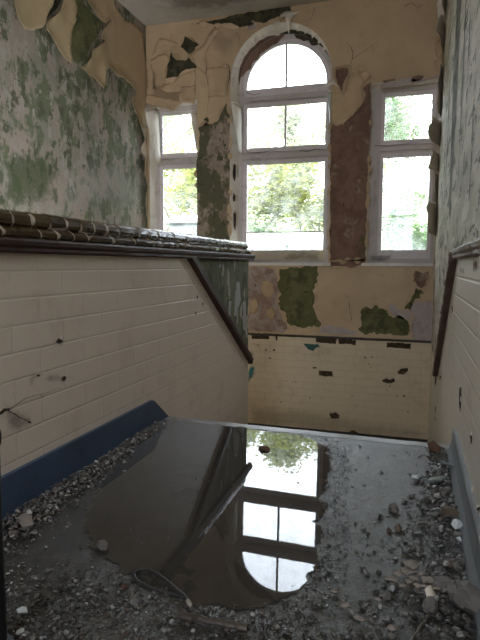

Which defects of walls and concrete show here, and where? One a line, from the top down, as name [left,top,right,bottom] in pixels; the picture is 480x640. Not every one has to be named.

peeling [197,6,328,85]
water stain [2,155,54,202]
peeling [14,0,242,240]
peeling [324,0,446,269]
peeling [198,259,431,351]
spalling [382,367,408,387]